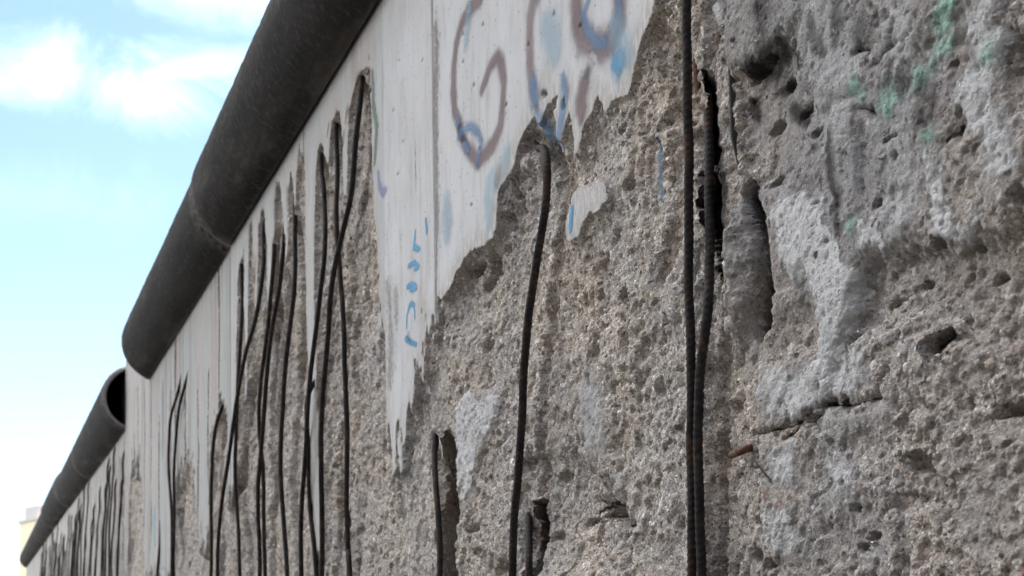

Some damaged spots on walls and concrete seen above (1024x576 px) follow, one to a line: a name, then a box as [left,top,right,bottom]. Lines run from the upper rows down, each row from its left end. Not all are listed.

spalling [167,371,210,576]
spalling [207,0,1024,576]